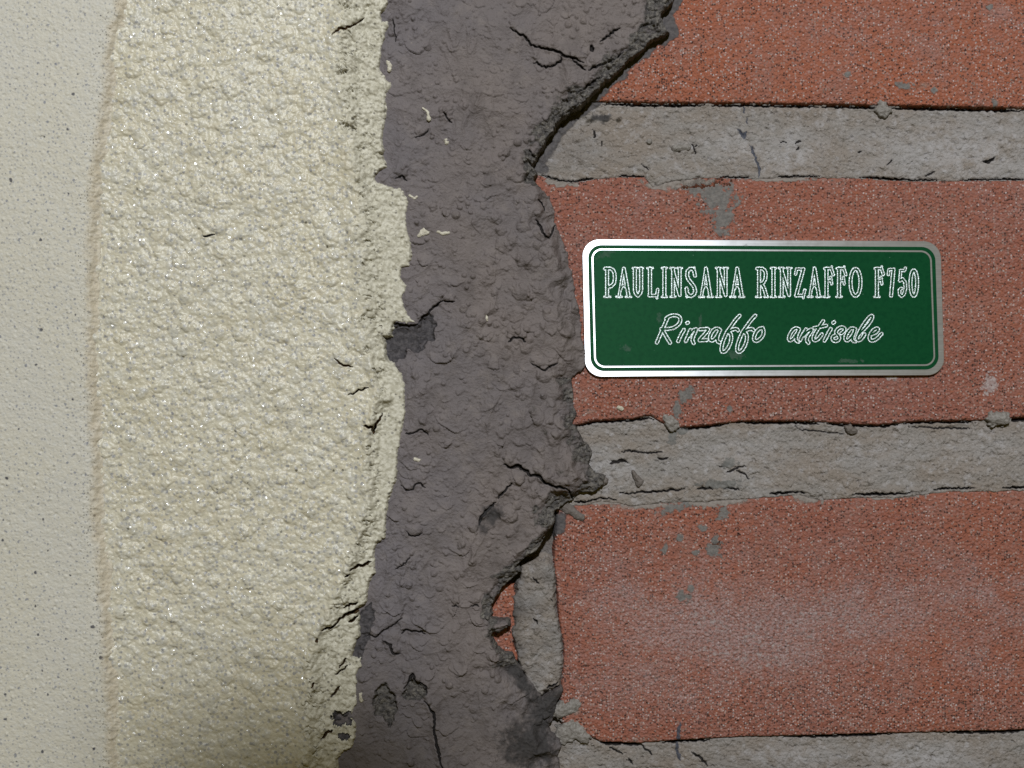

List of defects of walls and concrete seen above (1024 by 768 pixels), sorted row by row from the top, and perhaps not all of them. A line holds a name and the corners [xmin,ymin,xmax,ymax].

spalling [522,0,673,188]
crack [510,26,1024,181]
spalling [384,314,437,362]
crack [334,358,369,395]
crack [364,413,383,434]
crack [578,417,971,464]
crack [479,464,749,525]
crack [852,487,974,496]
spalling [480,378,605,668]
crack [345,531,422,577]
crack [311,602,443,768]
spalling [372,679,427,728]